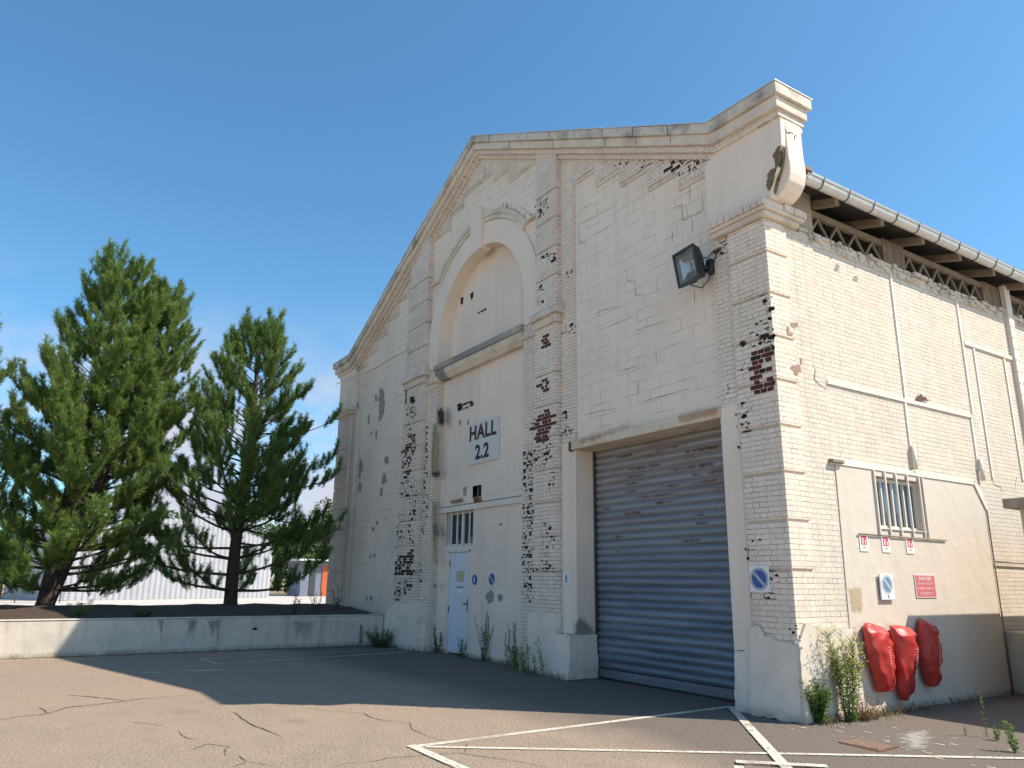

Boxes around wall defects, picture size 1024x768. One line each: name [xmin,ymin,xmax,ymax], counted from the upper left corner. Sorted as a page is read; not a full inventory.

flaking render [603,160,705,176]
flaking render [766,146,781,191]
flaking render [357,388,385,439]
flaking render [735,294,798,449]
flaking render [380,390,440,601]
flaking render [521,409,573,603]